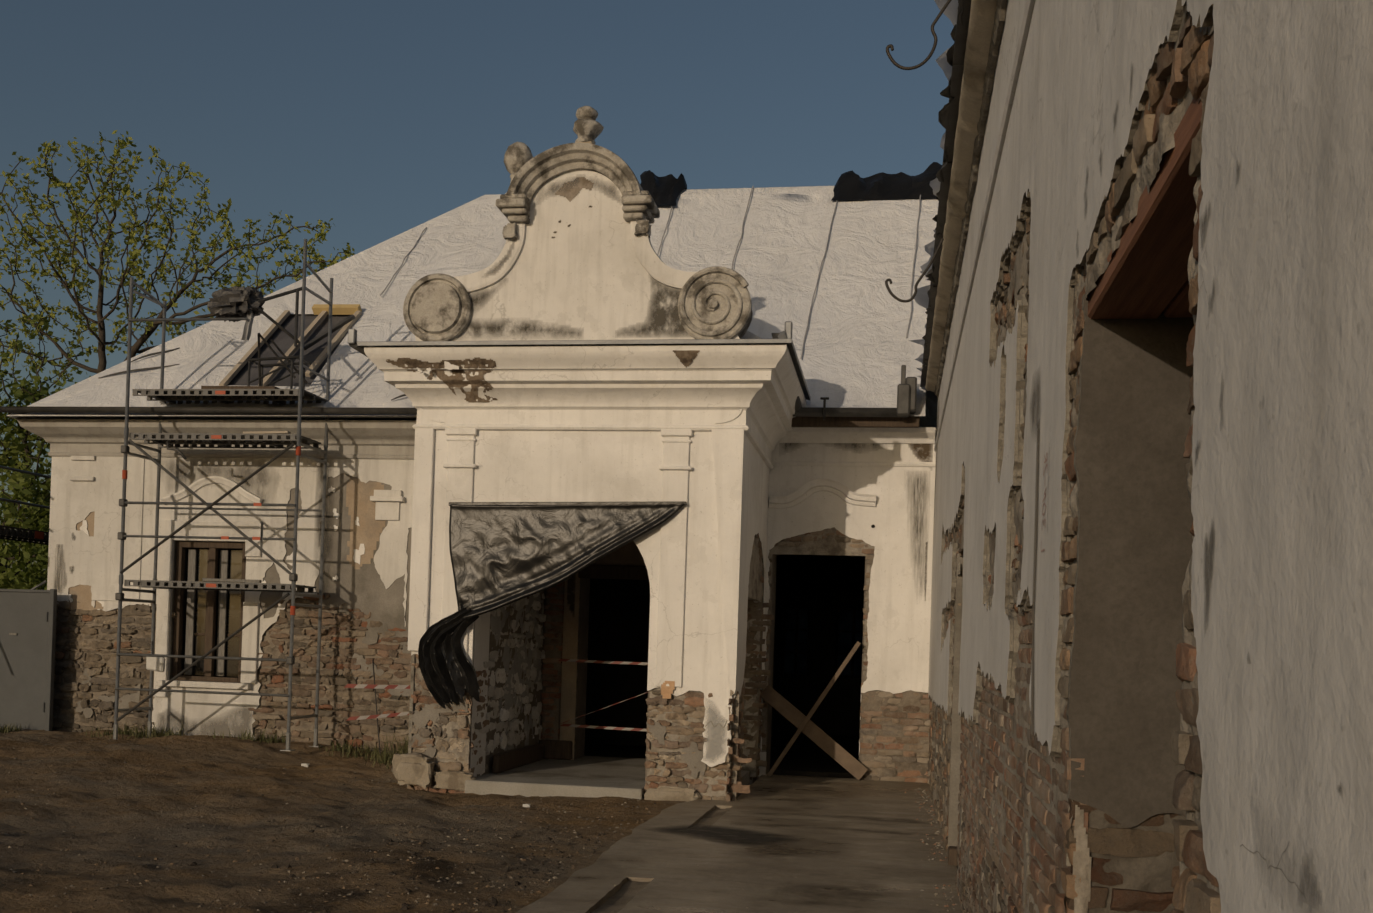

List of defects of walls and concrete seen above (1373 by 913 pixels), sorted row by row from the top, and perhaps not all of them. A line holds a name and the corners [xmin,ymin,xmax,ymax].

spalling [386,357,498,402]
flaking render [76,512,95,536]
flaking render [644,0,1221,913]
flaking render [52,585,177,733]
flaking render [248,473,546,794]